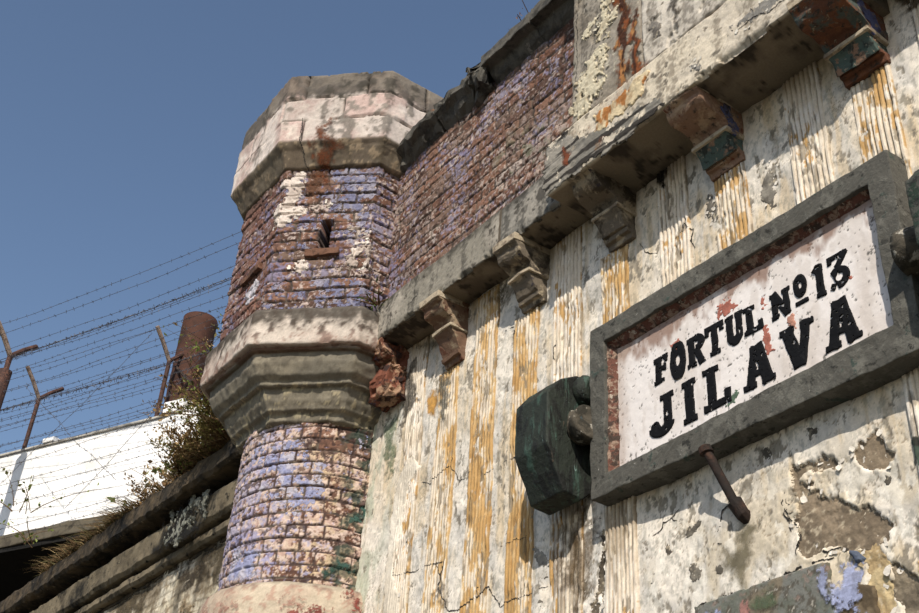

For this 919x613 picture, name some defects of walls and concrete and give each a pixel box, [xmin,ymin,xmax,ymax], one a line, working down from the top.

rust [612,0,648,89]
peeling [542,0,665,197]
rust [305,118,342,197]
peeling [244,168,394,309]
crack [424,451,515,486]
spalling [789,429,919,613]
crack [392,550,548,612]
spalling [689,563,702,582]